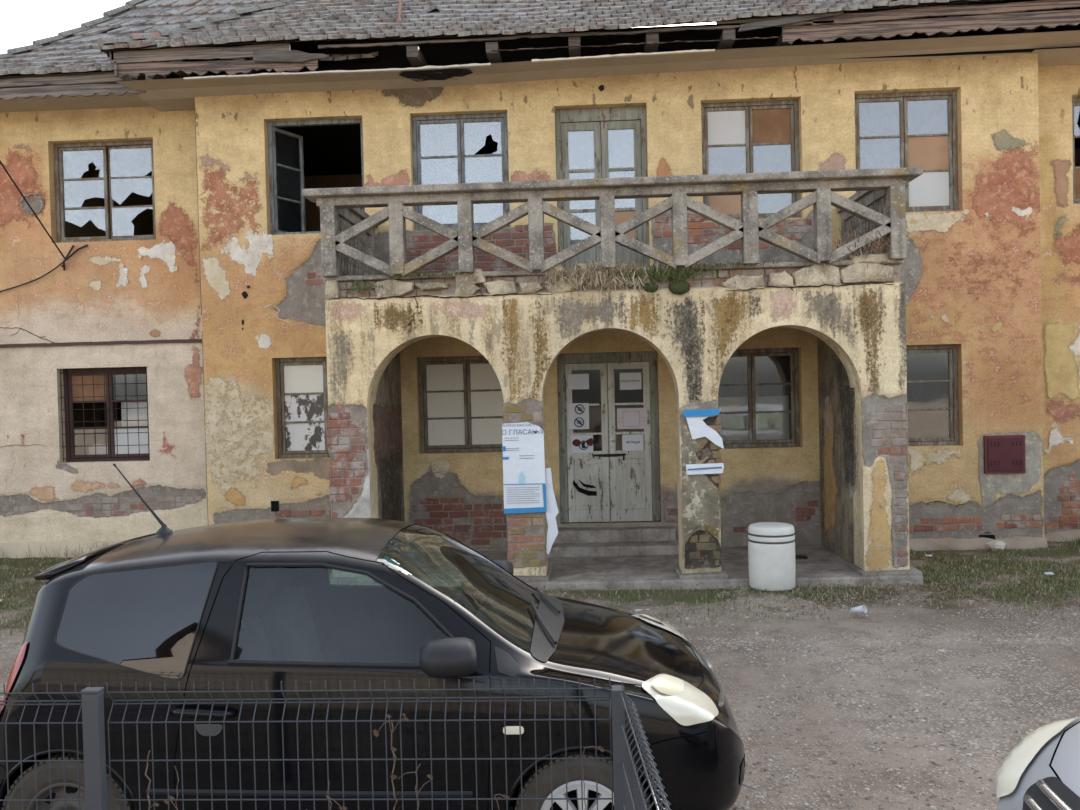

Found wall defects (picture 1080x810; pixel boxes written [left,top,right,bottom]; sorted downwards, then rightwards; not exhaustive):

peeling [0,145,46,228]
peeling [88,154,275,301]
spalling [274,129,1040,326]
flaking render [0,306,403,524]
water stain [328,330,353,390]
water stain [557,293,627,337]
water stain [653,297,709,402]
water stain [804,287,873,373]
peeling [1044,322,1080,454]
flaking render [409,459,507,551]
flaking render [679,396,855,569]
spalling [909,460,1080,539]